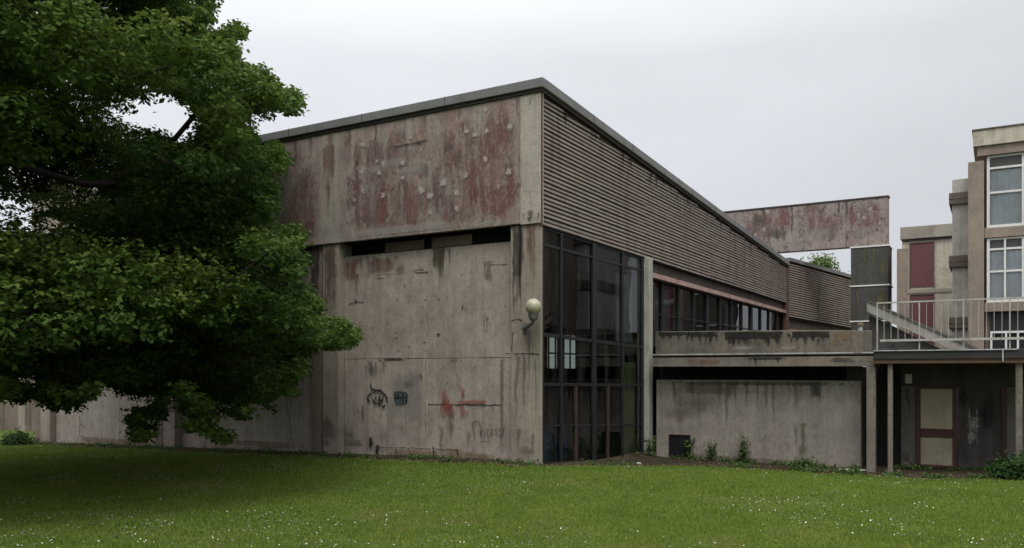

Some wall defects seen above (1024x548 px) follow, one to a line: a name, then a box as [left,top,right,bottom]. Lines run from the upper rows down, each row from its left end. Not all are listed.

peeling [346,107,515,227]
water stain [658,331,830,363]